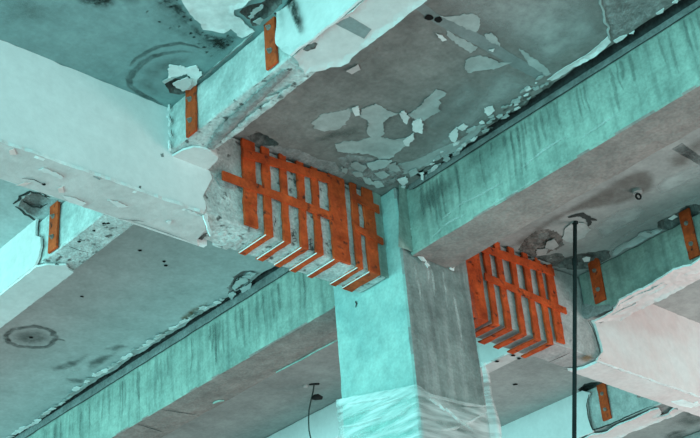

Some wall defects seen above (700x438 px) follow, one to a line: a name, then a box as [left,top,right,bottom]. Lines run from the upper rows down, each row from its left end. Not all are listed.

peeling [182,0,282,38]
peeling [162,64,202,95]
peeling [208,0,678,189]
spalling [19,168,86,217]
spalling [518,204,700,270]
peeling [6,270,258,438]
peeling [276,340,337,373]